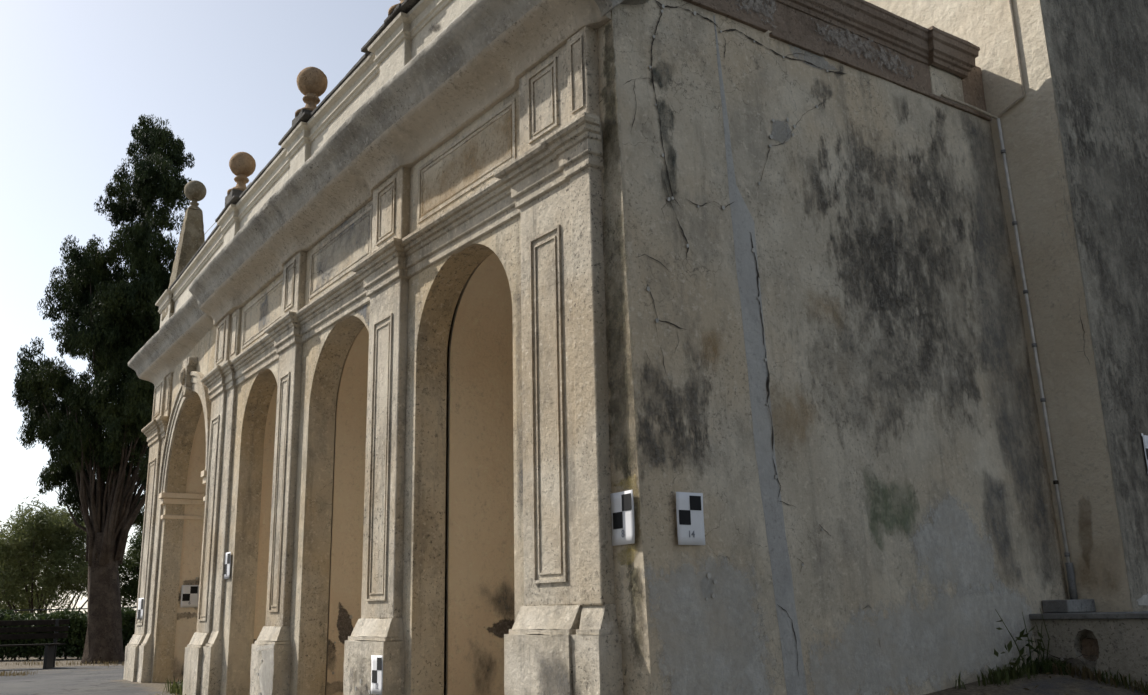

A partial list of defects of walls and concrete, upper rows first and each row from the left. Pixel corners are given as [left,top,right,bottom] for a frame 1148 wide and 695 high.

crack [598,0,846,376]
crack [750,233,831,536]
water stain [807,138,1051,695]
water stain [1055,0,1148,556]
peeling [326,603,353,685]
crack [777,604,799,675]